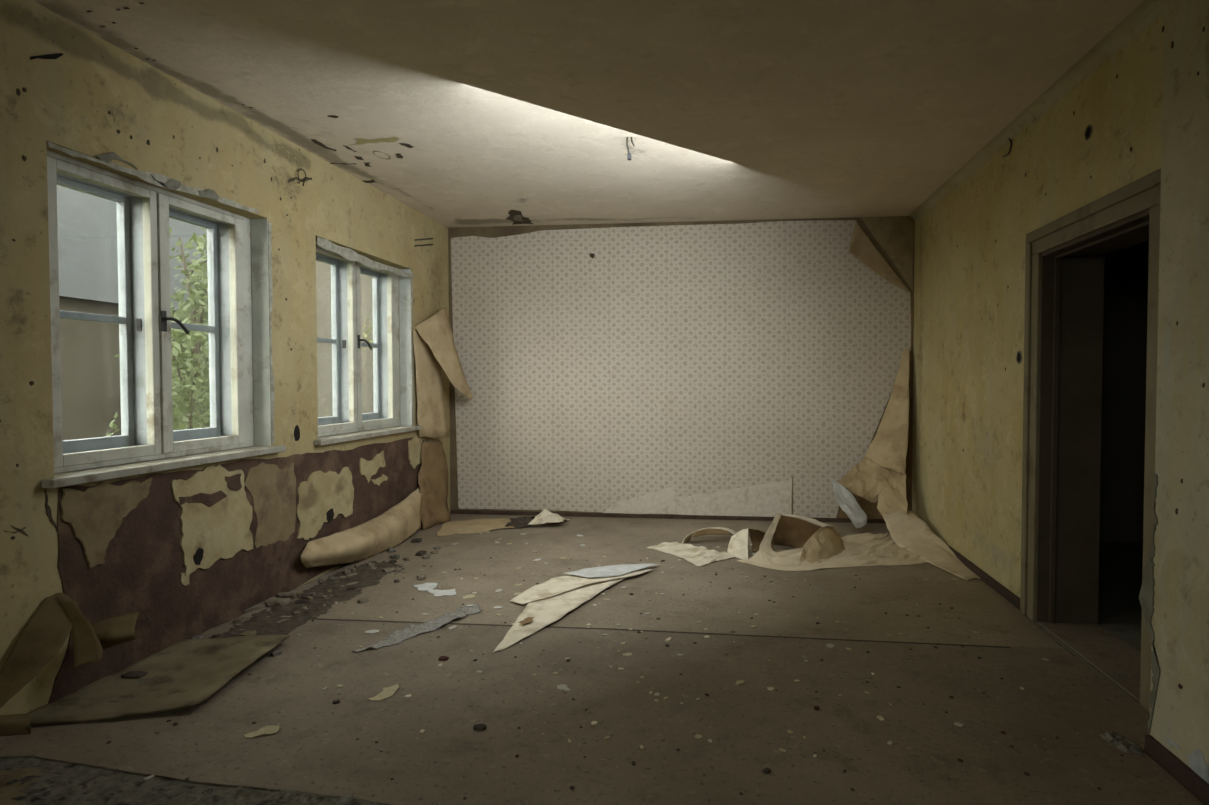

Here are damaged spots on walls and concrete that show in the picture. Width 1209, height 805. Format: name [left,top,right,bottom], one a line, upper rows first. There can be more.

peeling [47,139,424,703]
flaking render [848,489,884,519]
flaking render [861,216,914,511]
spalling [1139,473,1161,733]